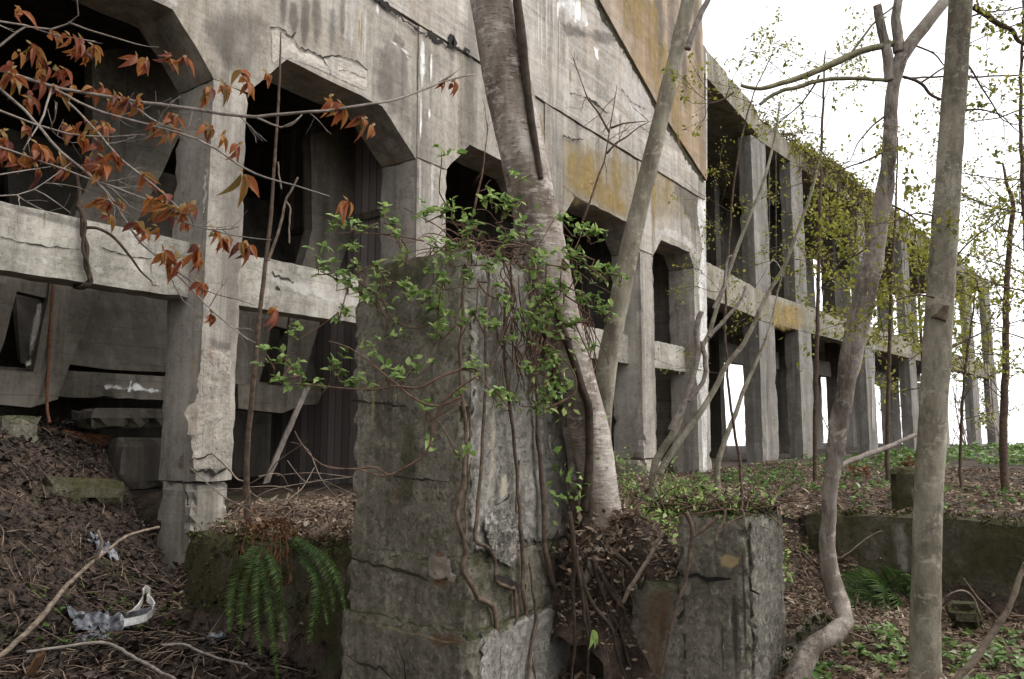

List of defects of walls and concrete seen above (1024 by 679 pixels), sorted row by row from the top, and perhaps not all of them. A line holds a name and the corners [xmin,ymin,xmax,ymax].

water stain [281,0,319,42]
spalling [271,29,367,90]
crack [271,27,368,78]
spalling [184,348,232,470]
spalling [485,454,520,567]
crack [341,554,428,581]
crack [677,573,760,595]